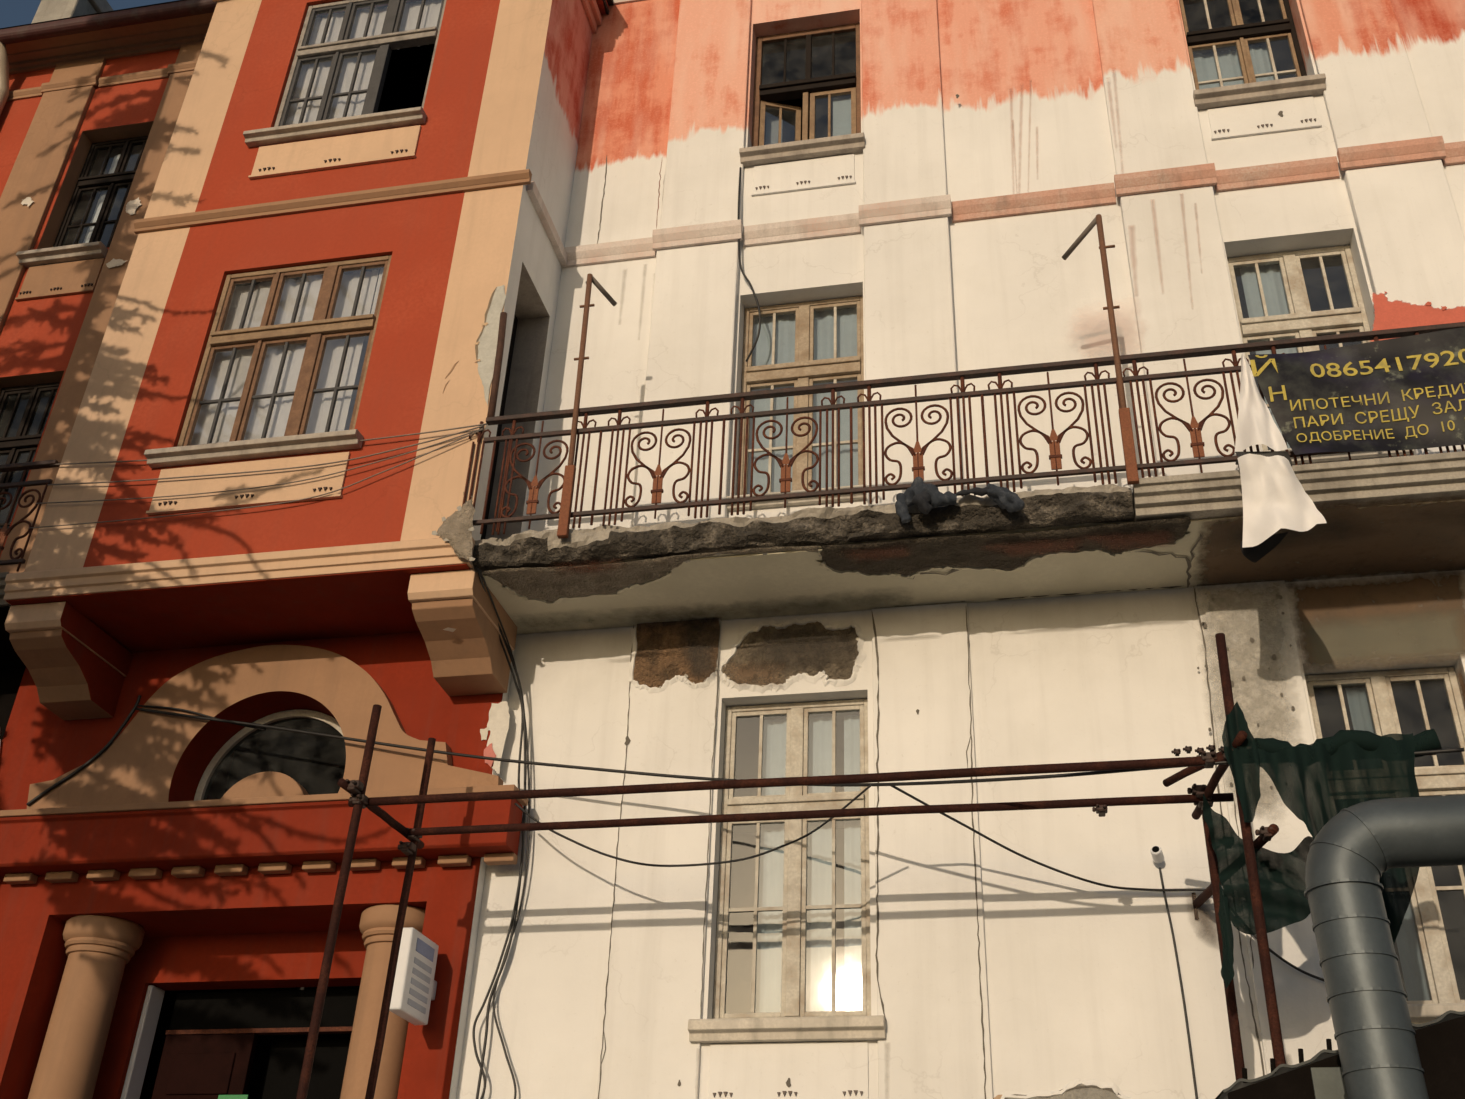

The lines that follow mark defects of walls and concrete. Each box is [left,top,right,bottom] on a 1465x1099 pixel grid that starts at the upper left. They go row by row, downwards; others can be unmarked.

peeling [126,197,141,215]
peeling [106,258,128,268]
spalling [475,285,506,406]
peeling [1371,291,1465,342]
spalling [432,496,1191,605]
spalling [627,616,867,694]